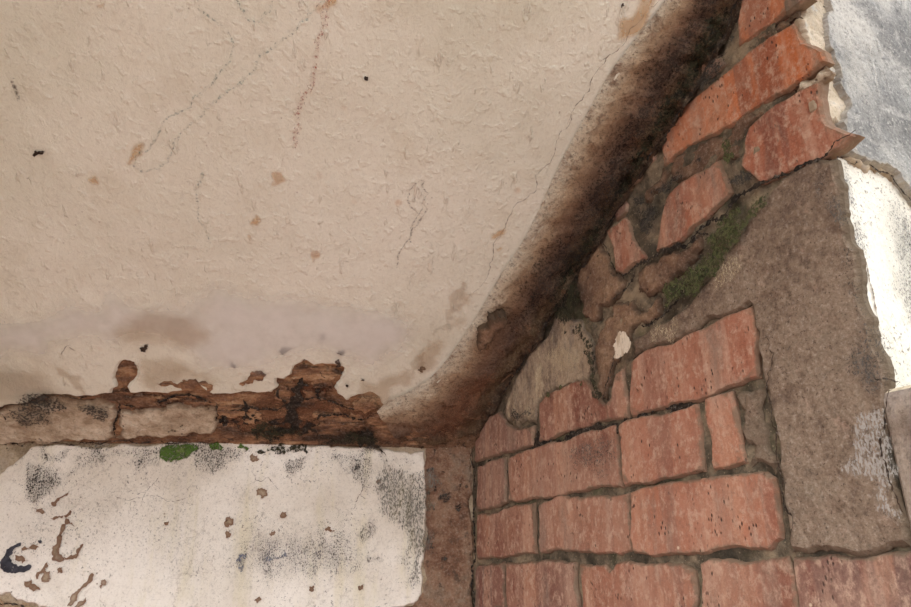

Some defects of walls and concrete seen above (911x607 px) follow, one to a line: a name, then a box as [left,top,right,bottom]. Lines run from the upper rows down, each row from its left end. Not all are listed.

water stain [493,0,735,349]
peeling [476,308,508,351]
water stain [6,392,67,428]
water stain [78,403,110,422]
spalling [120,350,383,449]
water stain [18,441,250,505]
crack [874,378,906,517]
peeling [15,544,39,563]
peeling [24,493,83,591]
water stain [240,517,380,584]
water stain [331,445,462,586]
peeling [67,573,107,607]